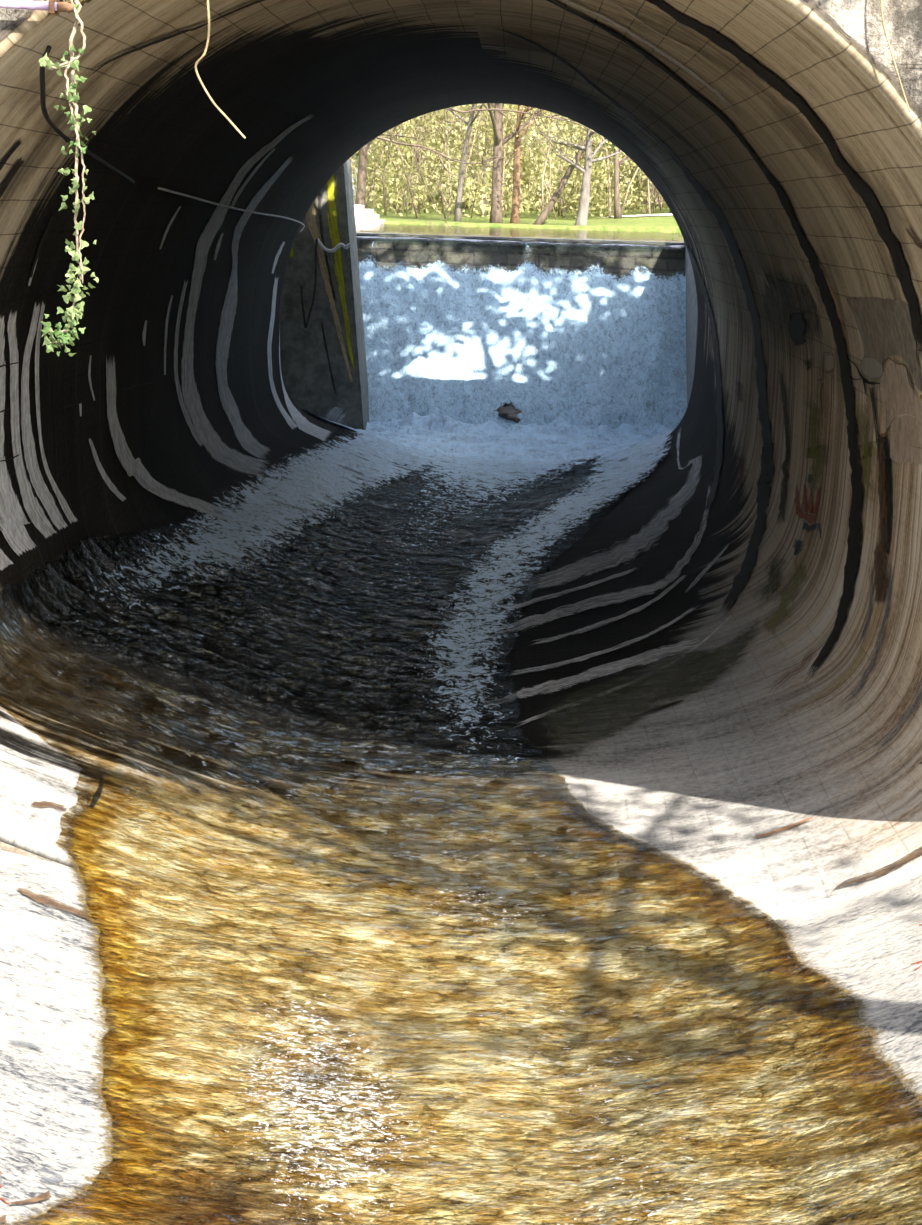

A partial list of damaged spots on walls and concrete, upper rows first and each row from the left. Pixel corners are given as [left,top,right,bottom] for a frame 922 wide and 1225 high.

flaking render [846,297,922,464]